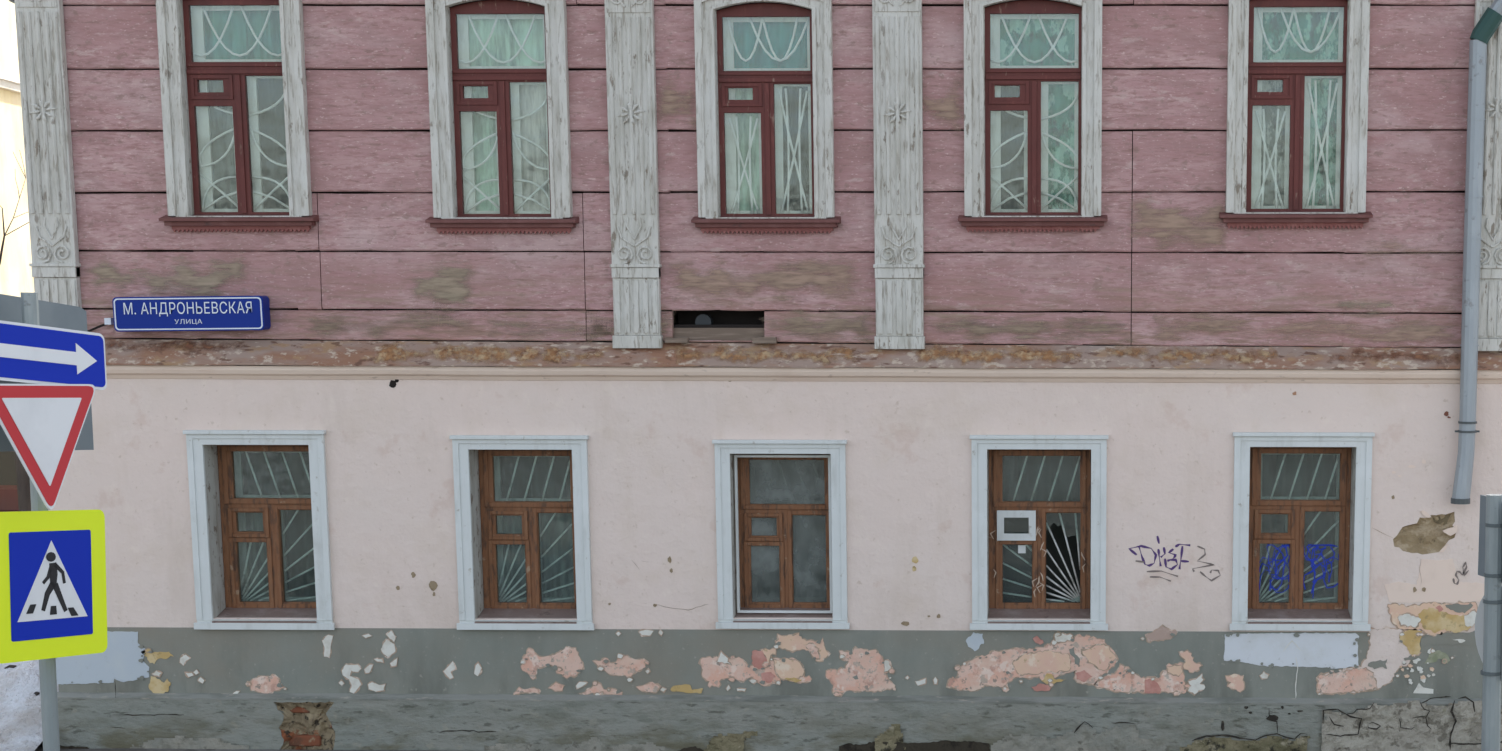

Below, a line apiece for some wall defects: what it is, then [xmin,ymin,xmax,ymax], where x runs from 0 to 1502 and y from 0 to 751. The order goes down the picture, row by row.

flaking render [1393,510,1457,554]
peeling [137,645,206,693]
peeling [322,630,398,693]
peeling [443,661,483,680]
peeling [513,624,1205,697]
flaking render [1180,587,1482,751]
flaking render [233,674,335,750]
flaking render [484,731,758,751]
spalling [839,724,990,751]